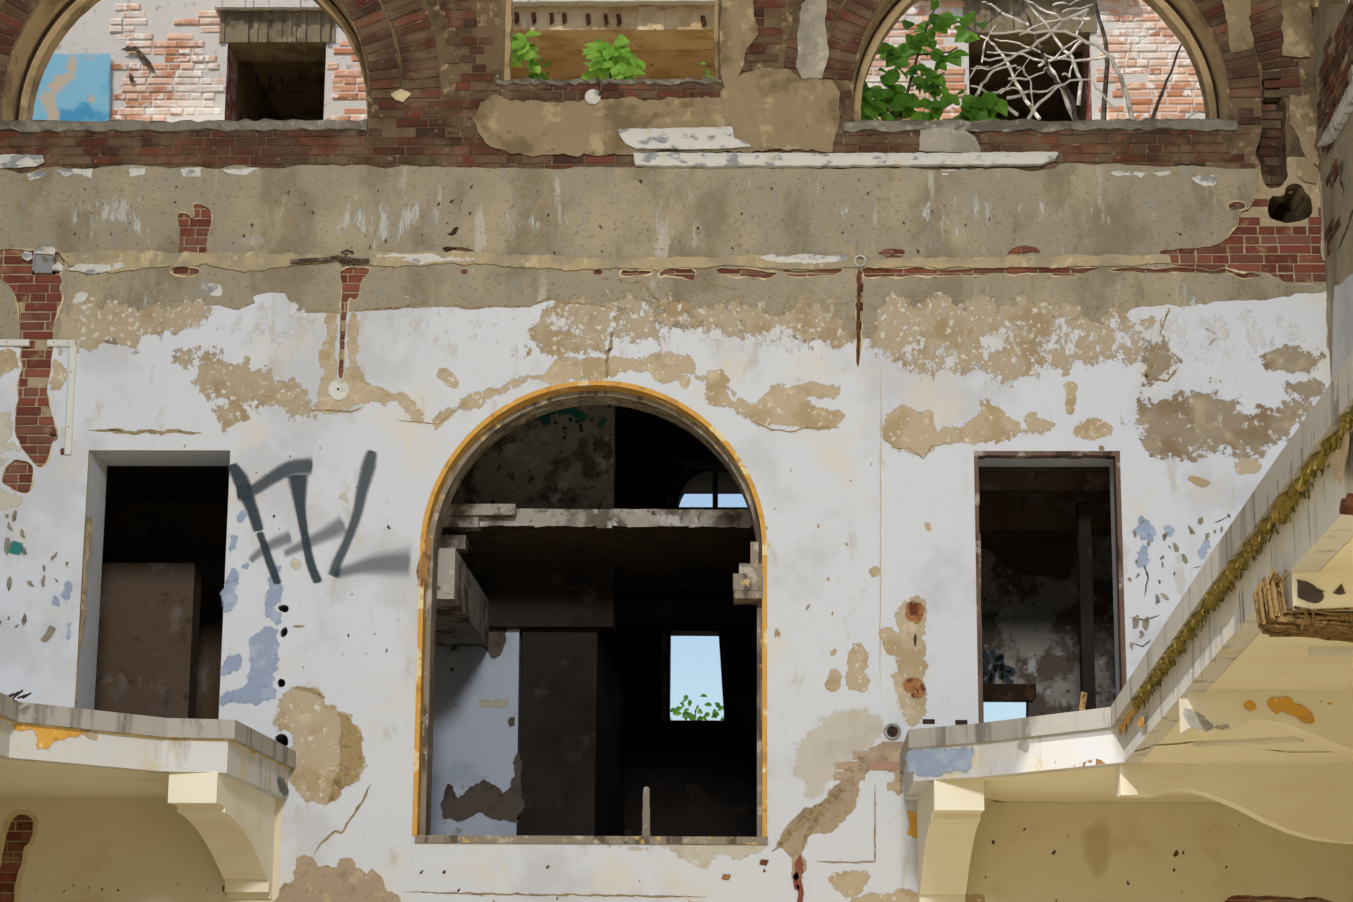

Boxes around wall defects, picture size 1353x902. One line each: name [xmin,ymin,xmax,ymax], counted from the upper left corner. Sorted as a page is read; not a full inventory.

peeling [0,0,1353,556]
leakage [1120,328,1337,517]
flaking render [416,533,431,589]
peeling [218,558,301,707]
peeling [824,642,870,693]
peeling [878,595,928,727]
leakage [1183,708,1229,732]
flaking render [0,809,38,902]
flaking render [585,741,904,879]
crack [772,789,876,902]
peeling [907,811,917,838]